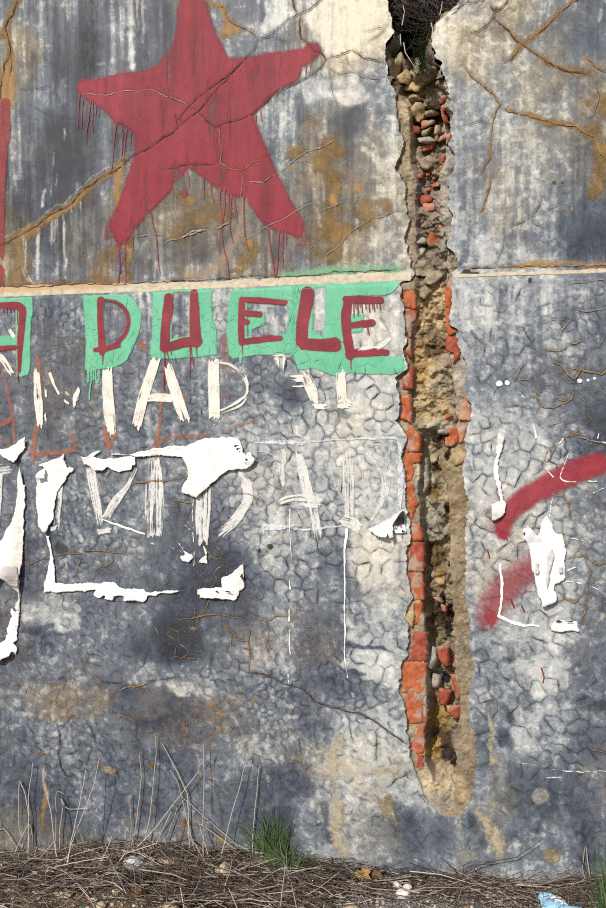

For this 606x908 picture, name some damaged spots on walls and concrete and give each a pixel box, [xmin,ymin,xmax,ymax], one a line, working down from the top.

crack [0,210,438,845]
spalling [376,794,398,824]
spalling [385,55,485,817]
crack [458,201,606,866]
crack [460,0,606,213]
rust [528,98,606,199]